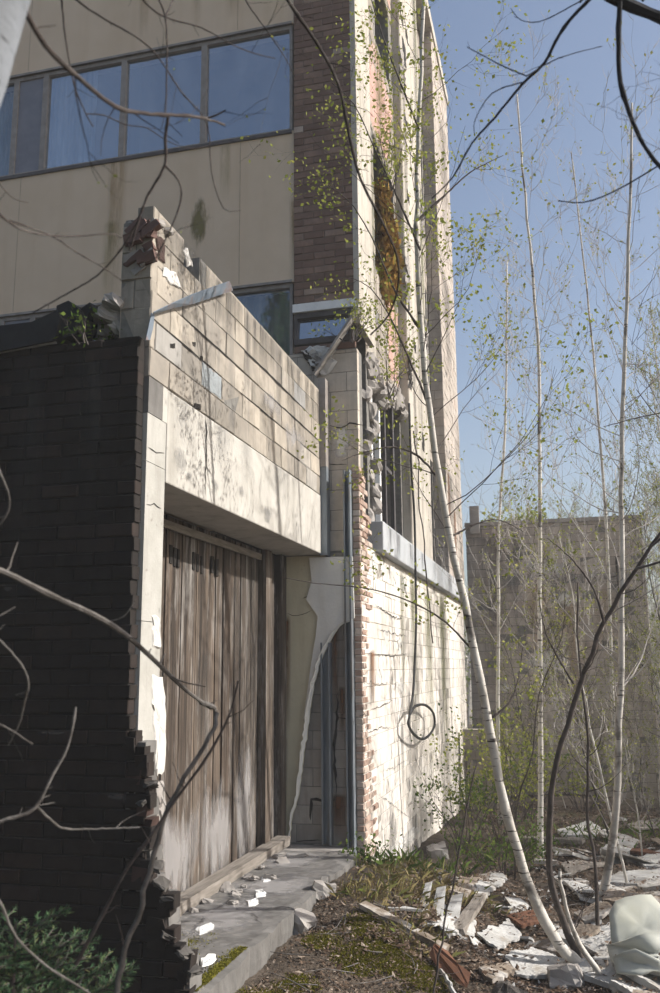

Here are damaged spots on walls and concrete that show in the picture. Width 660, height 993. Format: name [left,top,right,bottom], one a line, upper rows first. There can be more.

peeling [369,42,392,161]
spalling [387,0,412,143]
spalling [123,216,181,288]
spalling [183,247,193,267]
water stain [191,201,205,240]
crack [205,424,213,482]
peeling [286,302,429,861]
peeling [151,615,161,649]
spalling [123,674,217,993]
peeling [246,877,270,907]